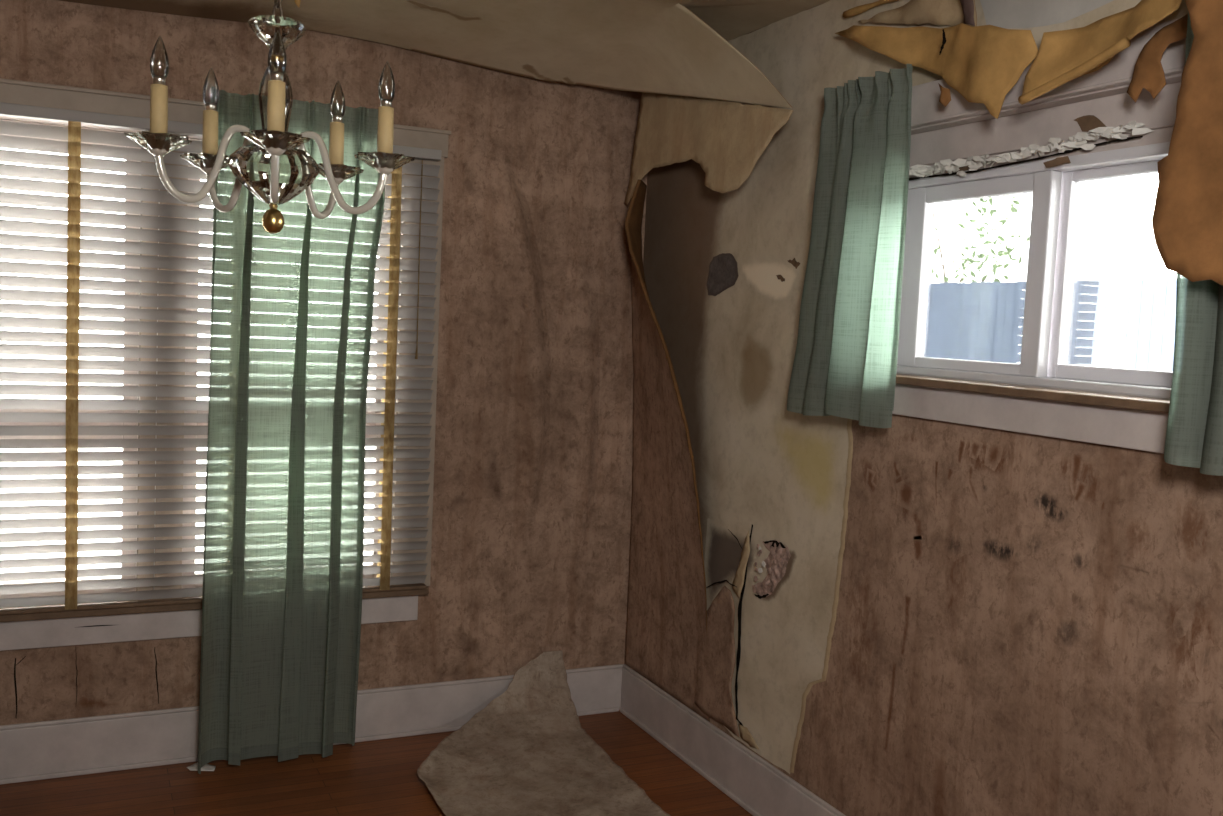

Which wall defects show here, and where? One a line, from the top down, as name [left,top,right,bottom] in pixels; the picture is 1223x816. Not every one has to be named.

flaking render [975,0,1141,50]
flaking render [1156,0,1188,24]
peeling [909,115,1154,181]
damp [643,159,736,561]
flaking render [624,0,951,774]
damp [734,321,847,530]
damp [939,486,1075,567]
crack [706,525,759,749]